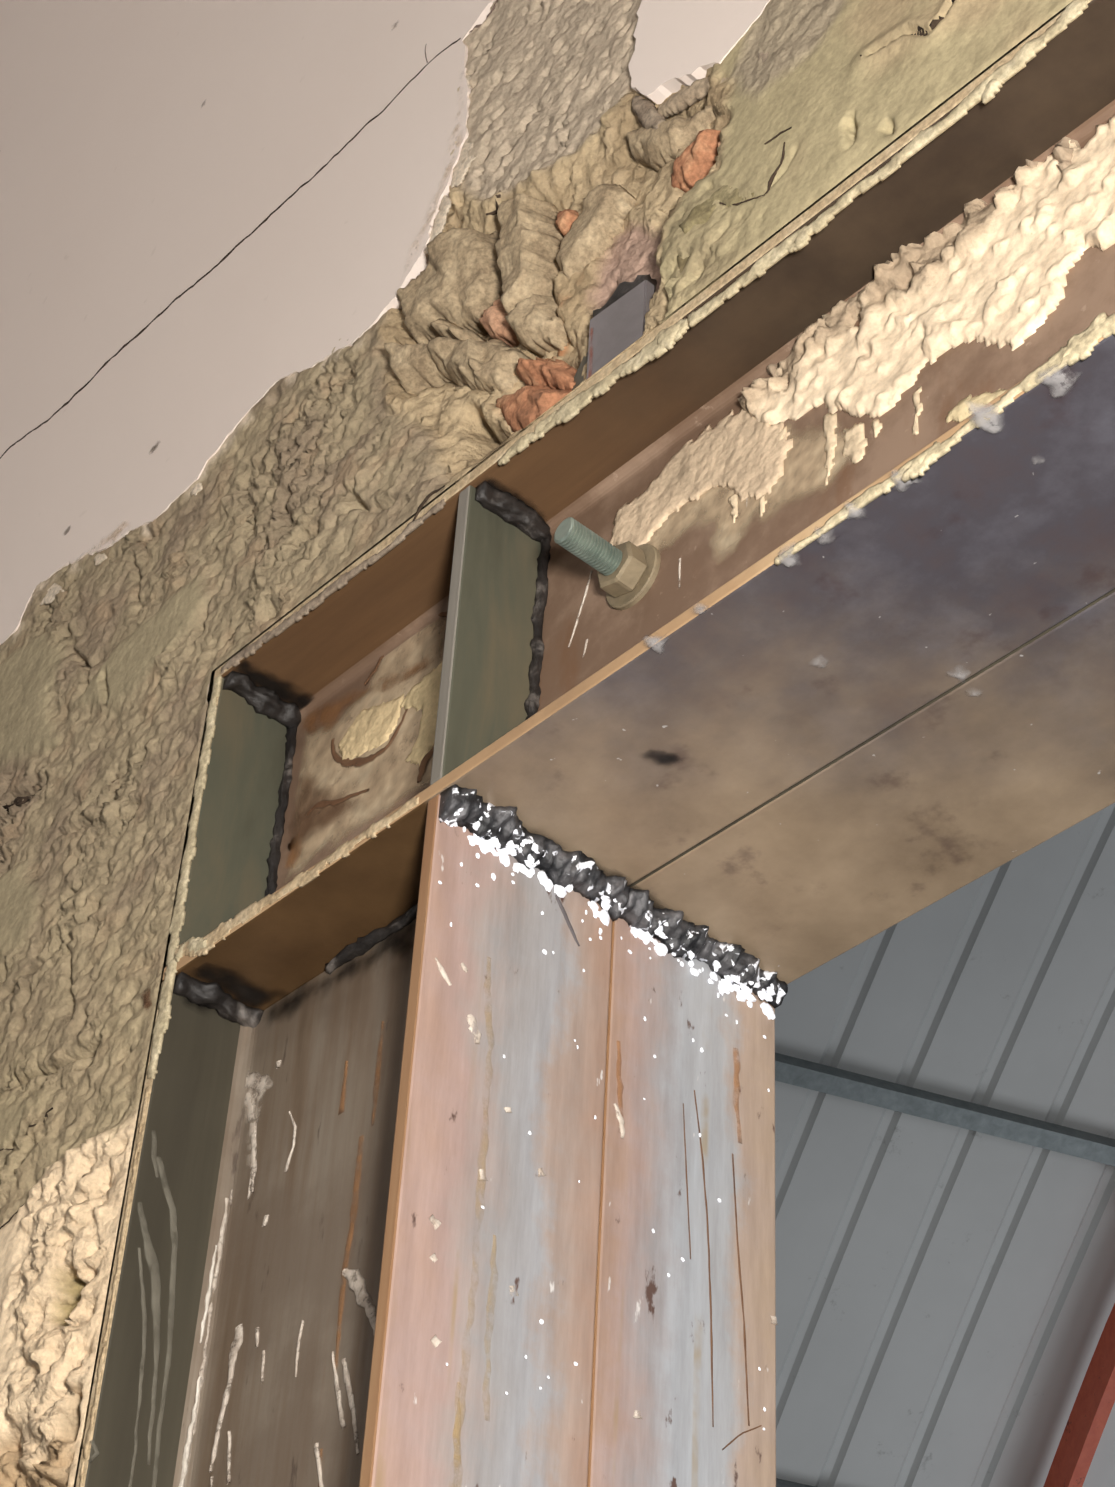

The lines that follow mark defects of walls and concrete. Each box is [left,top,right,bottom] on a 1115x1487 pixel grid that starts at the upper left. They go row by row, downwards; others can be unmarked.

crack [911,0,955,36]
crack [719,127,792,206]
crack [486,191,501,215]
crack [0,0,498,459]
spalling [380,0,754,482]
peeling [190,482,203,496]
crack [413,485,445,521]
peeling [40,583,65,606]
crack [0,1107,53,1151]
spalling [0,1111,138,1487]